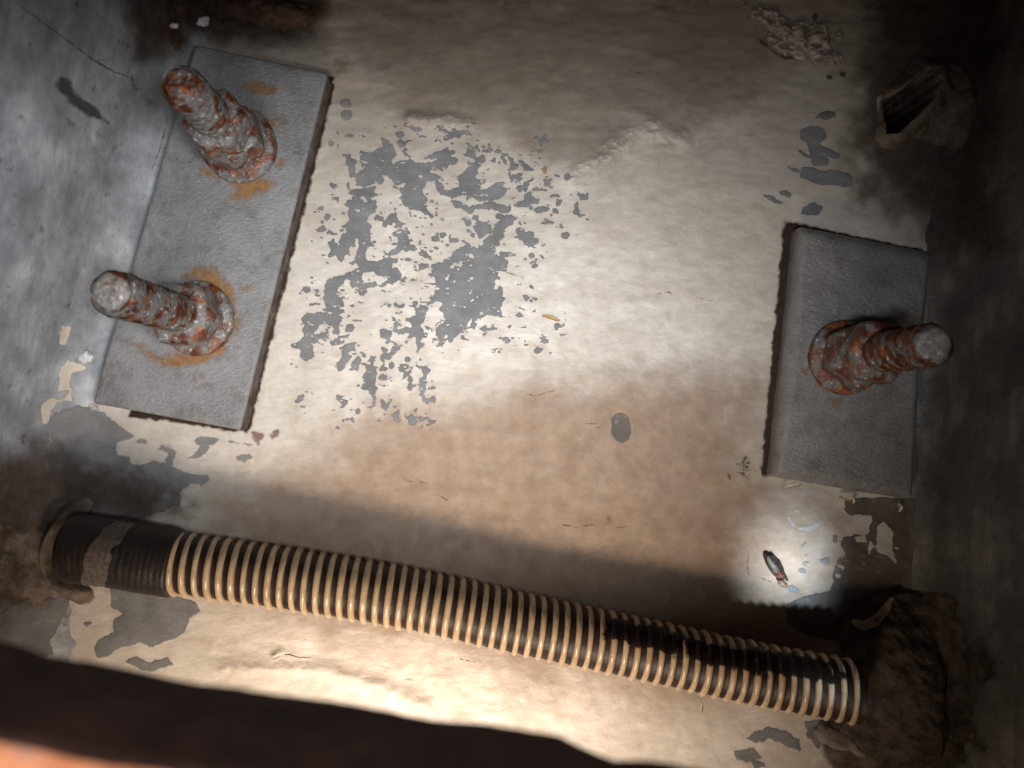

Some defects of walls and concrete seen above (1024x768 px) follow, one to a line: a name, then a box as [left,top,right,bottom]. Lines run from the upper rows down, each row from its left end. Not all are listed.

peeling [788,111,852,187]
hole [875,57,977,153]
corrosion [129,77,334,441]
peeling [290,123,589,429]
corrosion [761,223,922,476]
peeling [41,360,209,519]
peeling [190,437,232,458]
peeling [611,413,631,443]
peeling [786,495,917,640]
peeling [0,597,69,656]
peeling [94,589,200,672]
peeling [735,720,821,768]